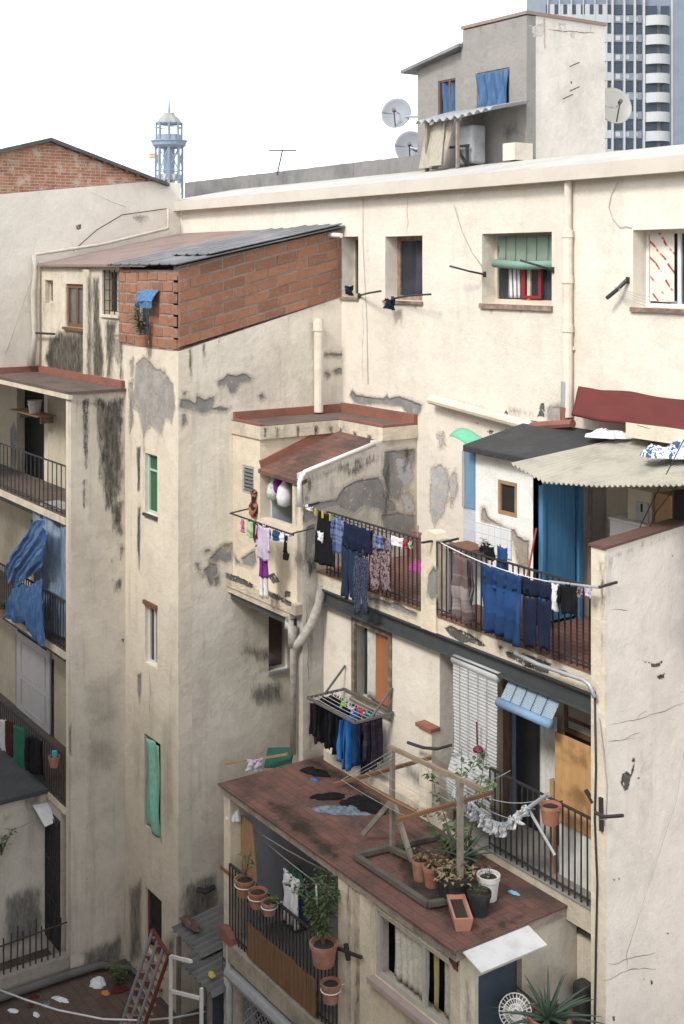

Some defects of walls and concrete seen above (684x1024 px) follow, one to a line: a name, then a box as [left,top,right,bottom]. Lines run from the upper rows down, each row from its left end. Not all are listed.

leakage [46,279,122,377]
peeling [113,333,252,437]
peeling [350,390,422,414]
leakage [83,399,123,534]
peeling [302,448,416,561]
peeling [430,465,458,524]
peeling [195,543,291,606]
leakage [256,683,280,702]
spalling [621,758,640,791]
leakage [7,891,39,941]
crack [604,953,654,981]